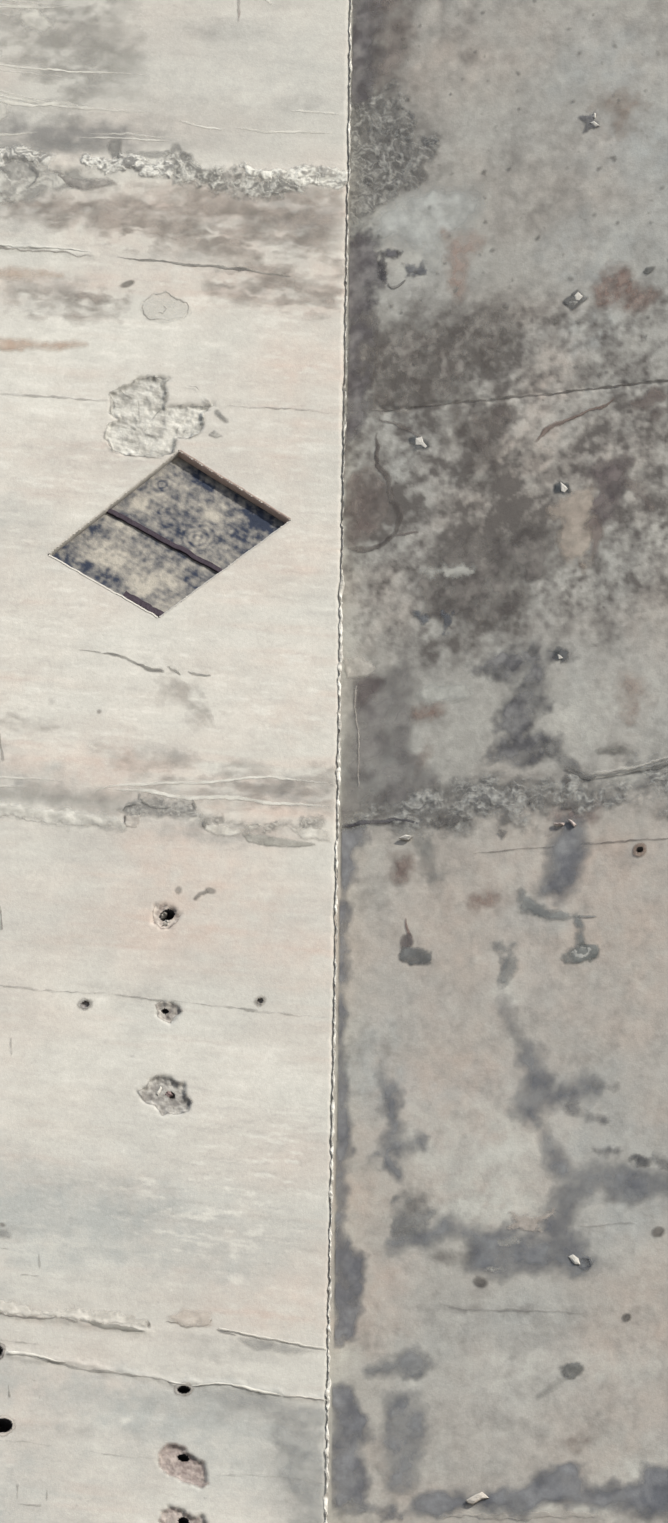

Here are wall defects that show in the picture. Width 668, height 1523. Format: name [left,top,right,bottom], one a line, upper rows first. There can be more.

rust [0,339,71,350]
spalling [104,375,227,457]
water stain [413,489,593,634]
spalling [323,0,353,1523]
water stain [520,820,595,946]
water stain [335,668,434,1345]
spalling [137,1075,193,1115]
water stain [389,1138,668,1275]
crack [0,1313,235,1335]
spalling [160,1508,204,1523]
spalling [159,1444,208,1487]
water stain [277,1385,668,1520]